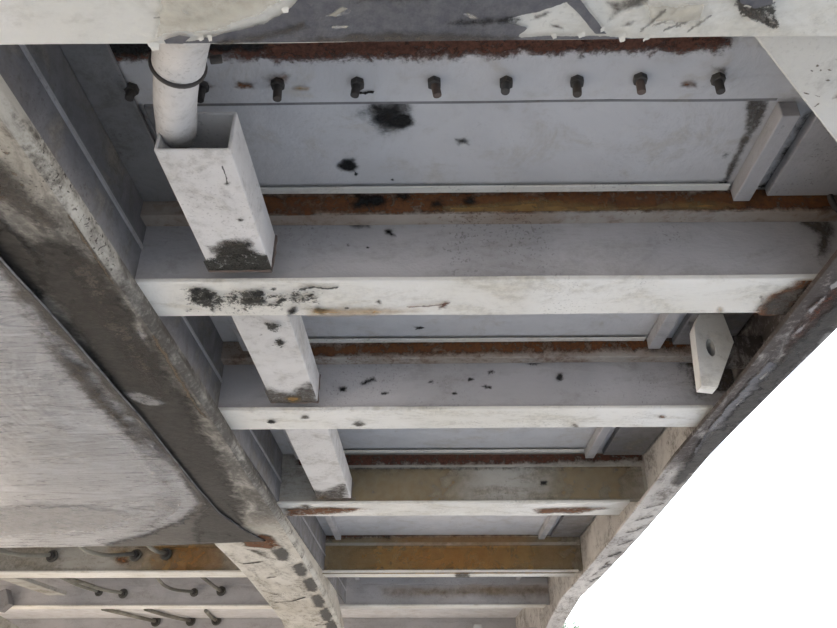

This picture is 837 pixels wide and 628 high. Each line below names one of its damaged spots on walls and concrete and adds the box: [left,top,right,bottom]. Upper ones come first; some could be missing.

peeling [147,0,650,51]
rust [109,44,151,62]
rust [207,36,732,64]
rust [262,189,832,216]
rust [756,280,813,315]
rust [311,338,691,357]
rust [286,454,642,516]
rust [323,535,582,574]